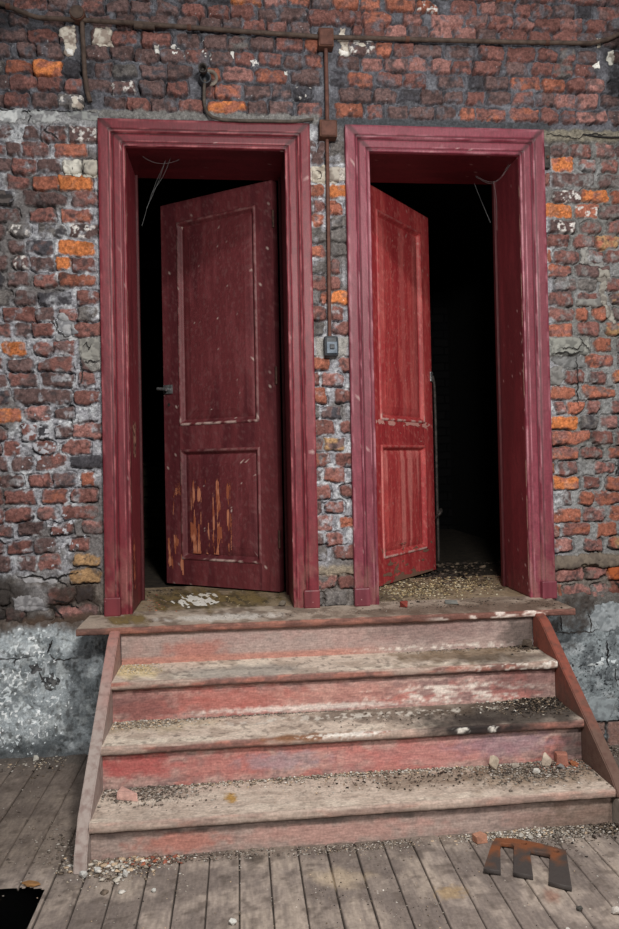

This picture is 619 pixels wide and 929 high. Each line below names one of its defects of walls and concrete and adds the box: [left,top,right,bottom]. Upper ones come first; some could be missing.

peeling [190,480,232,555]
peeling [168,535,184,575]
crack [17,572,79,619]
crack [0,640,71,682]
crack [555,613,617,681]